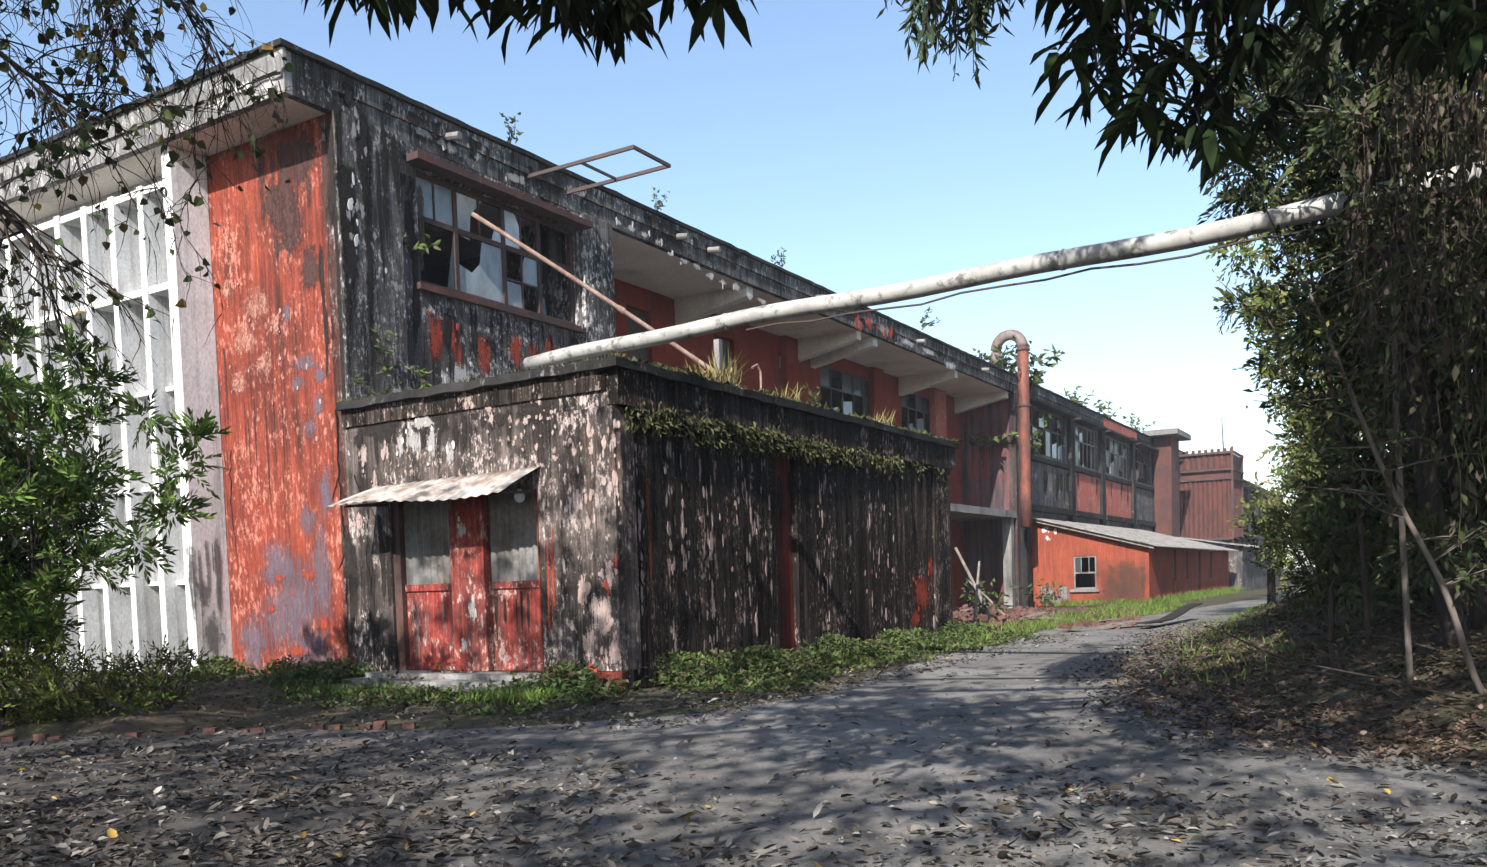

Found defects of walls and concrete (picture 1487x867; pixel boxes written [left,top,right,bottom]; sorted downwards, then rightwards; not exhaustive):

leakage [468,138,490,164]
leakage [259,81,440,400]
peeling [223,279,325,441]
peeling [427,309,491,384]
leakage [442,308,503,360]
leakage [529,320,553,354]
peeling [241,467,333,668]
peeling [358,416,455,488]
peeling [484,399,645,616]
spalling [578,556,620,672]
peeling [664,440,775,656]
leakage [582,413,927,631]